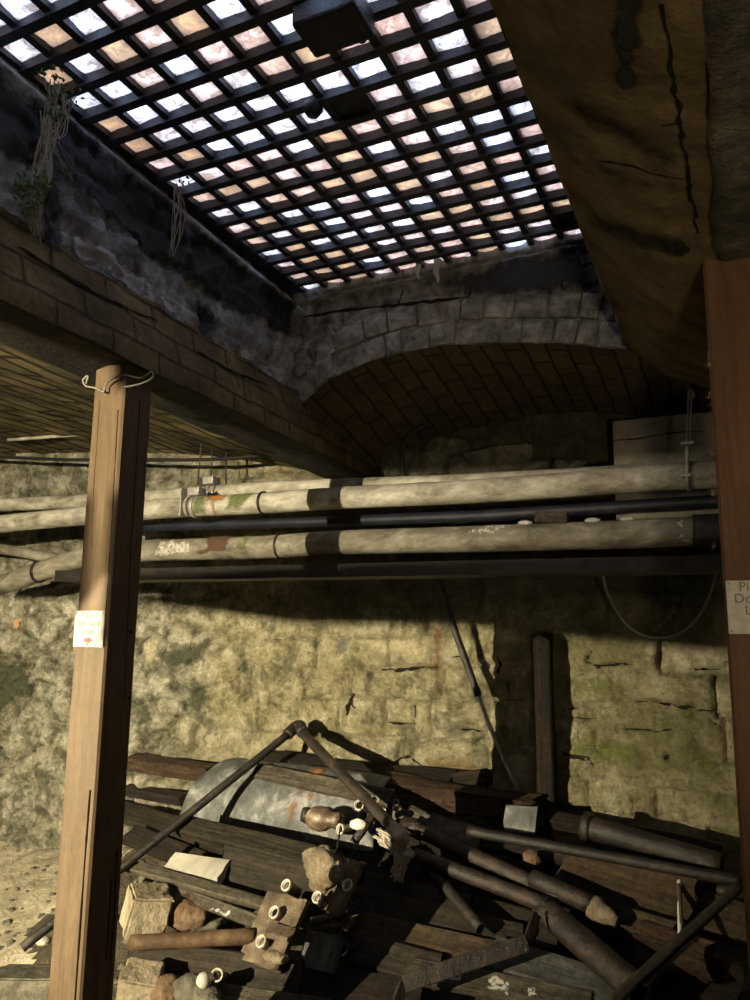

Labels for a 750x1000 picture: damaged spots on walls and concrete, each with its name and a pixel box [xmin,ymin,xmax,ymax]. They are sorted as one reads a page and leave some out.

crack [600,3,699,234]
crack [304,290,471,317]
crack [382,656,460,672]
crack [585,651,633,669]
crack [345,690,355,716]
crack [625,700,722,732]